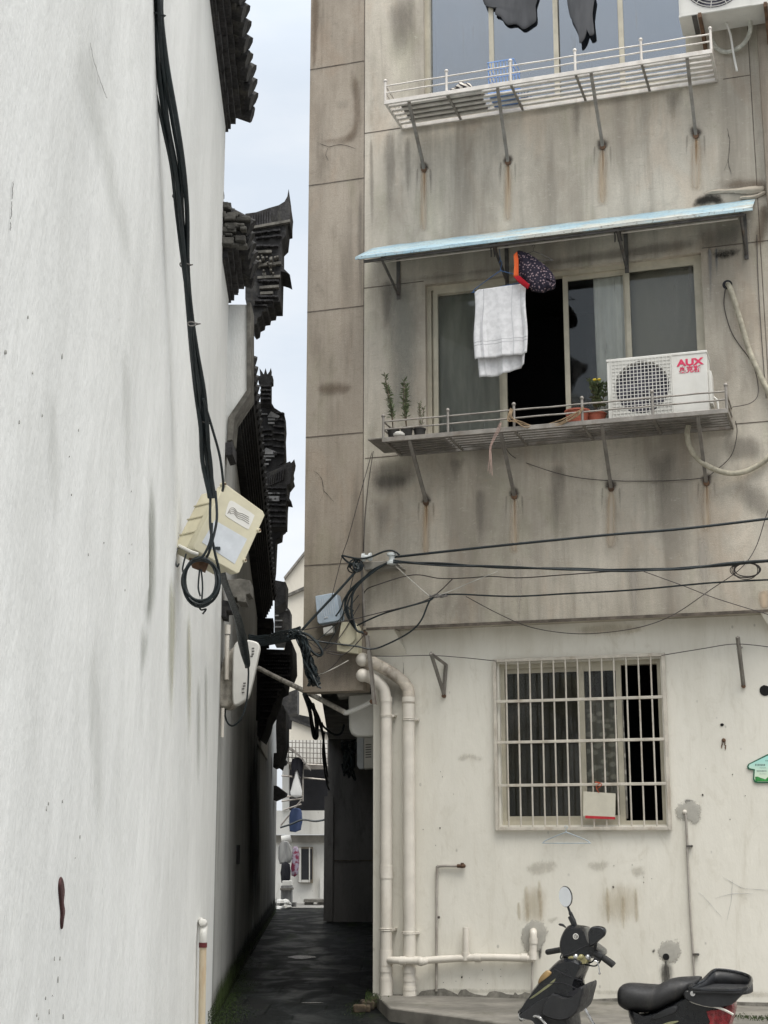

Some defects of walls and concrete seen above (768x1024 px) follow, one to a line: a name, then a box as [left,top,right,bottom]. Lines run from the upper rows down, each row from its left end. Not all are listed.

rust [504,156,512,219]
rust [598,140,607,202]
rust [691,128,701,188]